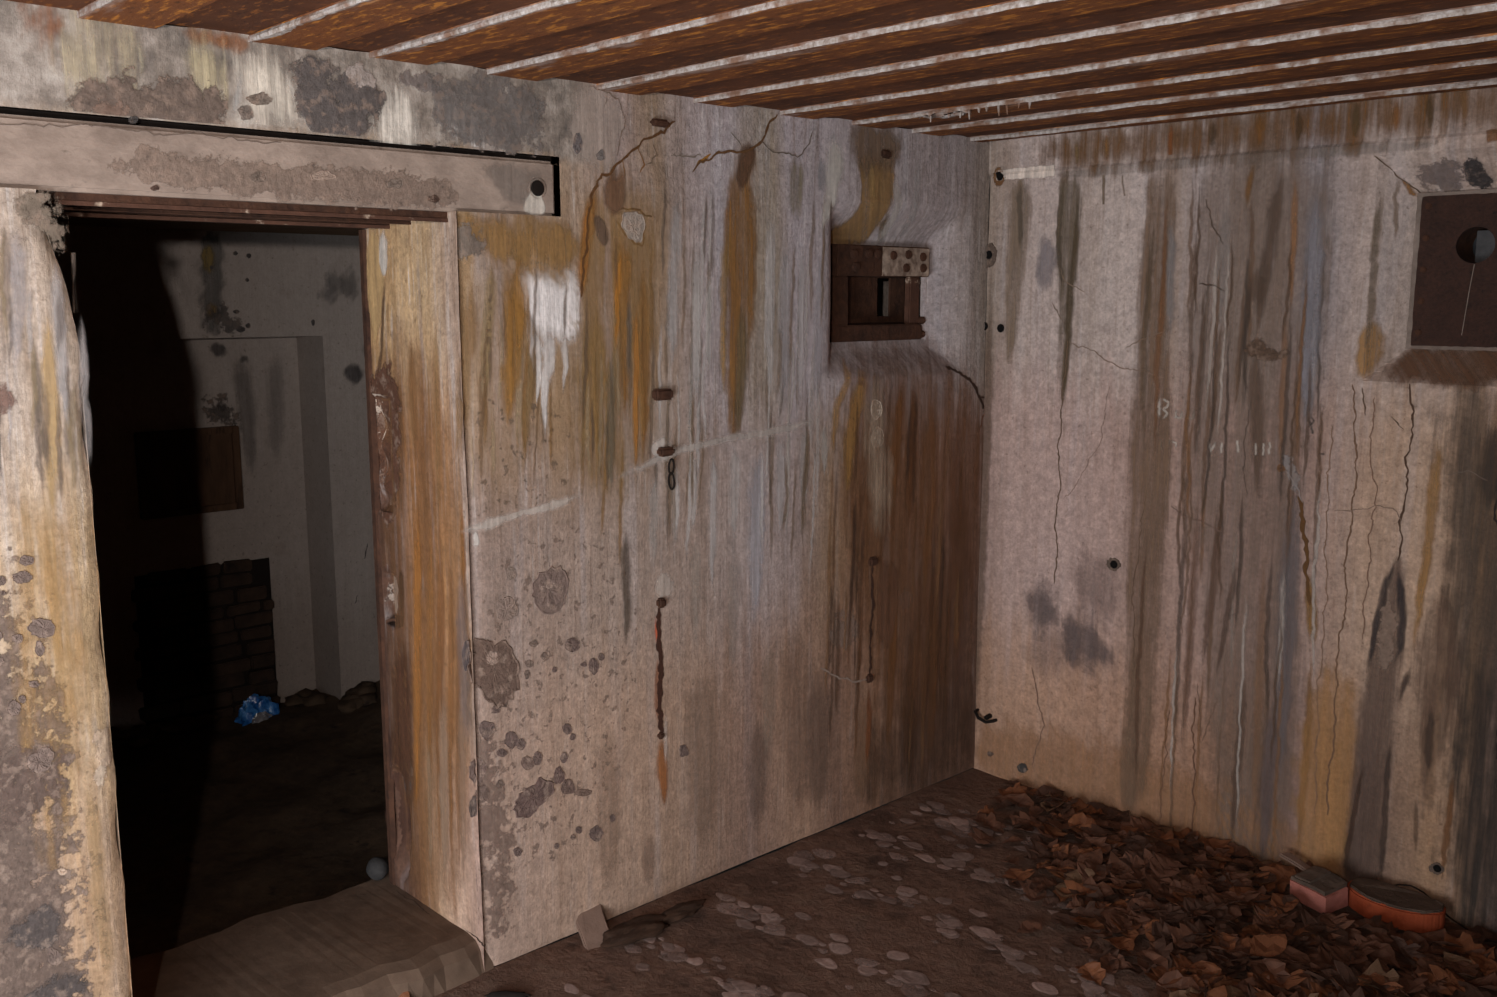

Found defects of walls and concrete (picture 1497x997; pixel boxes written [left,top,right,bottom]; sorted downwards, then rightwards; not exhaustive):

spalling [65,66,273,125]
spalling [107,144,459,211]
peeling [288,55,547,158]
crack [580,86,813,297]
rust [831,126,900,244]
rust [370,353,416,527]
damp [520,269,580,426]
rust [721,146,756,435]
damp [980,168,1125,577]
damp [1121,149,1329,859]
rust [655,608,667,802]
damp [1345,388,1497,928]